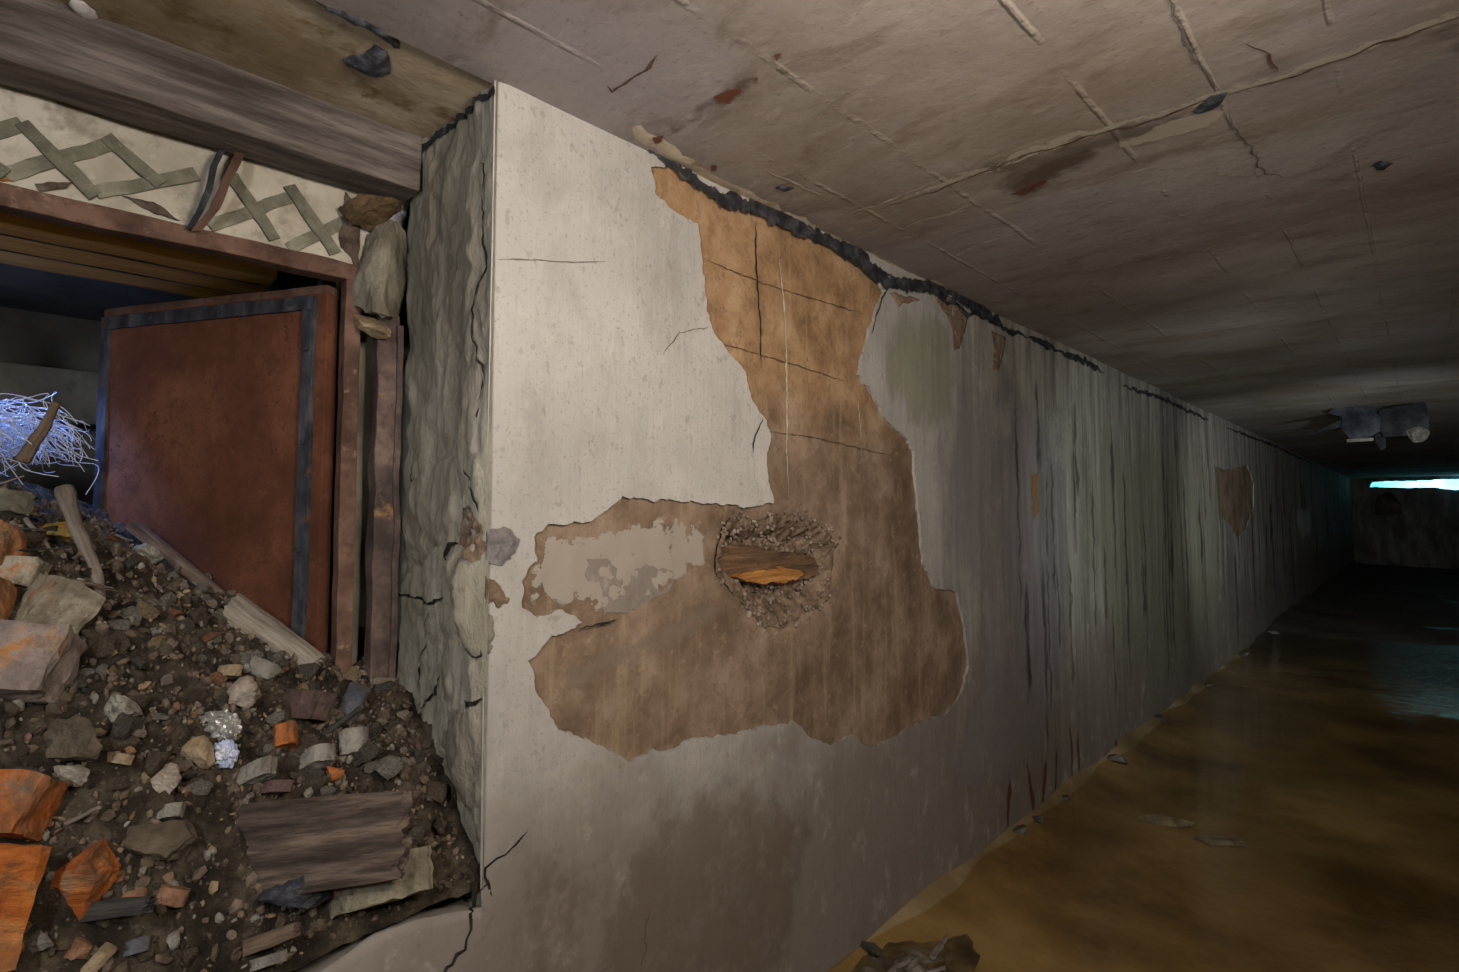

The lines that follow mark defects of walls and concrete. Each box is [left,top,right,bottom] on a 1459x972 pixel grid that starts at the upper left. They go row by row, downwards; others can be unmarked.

crack [877,0,1459,210]
water stain [1120,111,1223,148]
crack [471,152,603,418]
crack [648,149,1316,465]
crack [463,470,478,512]
flaking render [459,166,969,761]
flaking render [1215,465,1253,538]
crack [443,832,527,972]